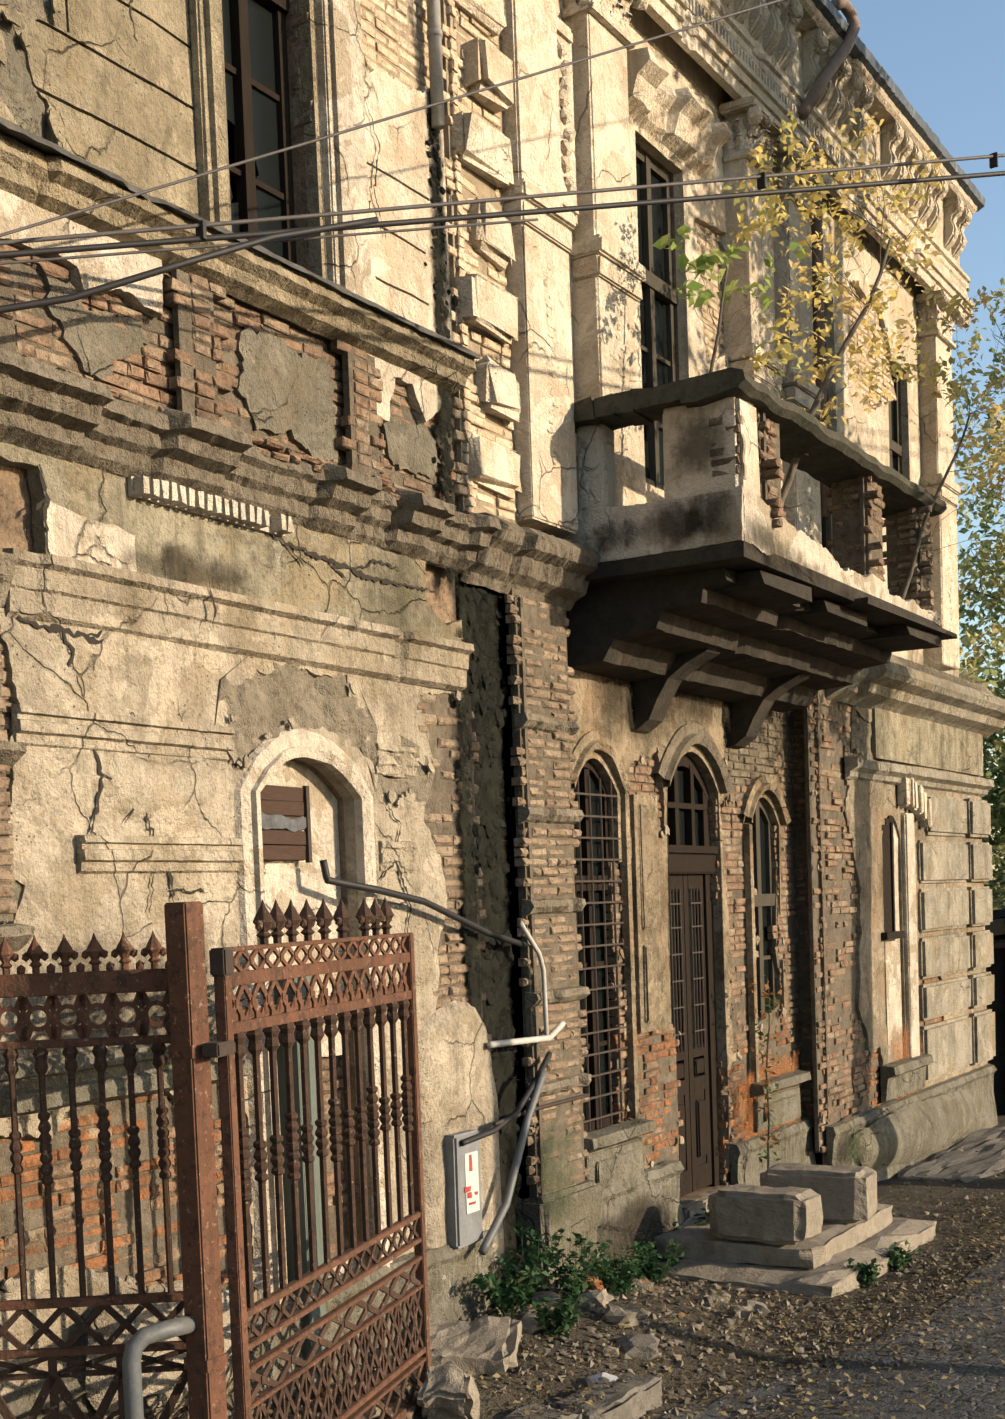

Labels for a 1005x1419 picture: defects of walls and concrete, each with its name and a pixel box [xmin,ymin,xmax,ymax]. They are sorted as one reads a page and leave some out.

flaking render [0,0,66,142]
leakage [427,95,449,339]
flaking render [0,245,177,410]
flaking render [213,294,347,466]
flaking render [378,383,456,510]
leakage [437,386,455,507]
crack [272,534,436,593]
flaking render [0,641,27,758]
crack [19,615,104,667]
crack [90,750,154,836]
crack [141,872,208,915]
leakage [446,567,521,1294]